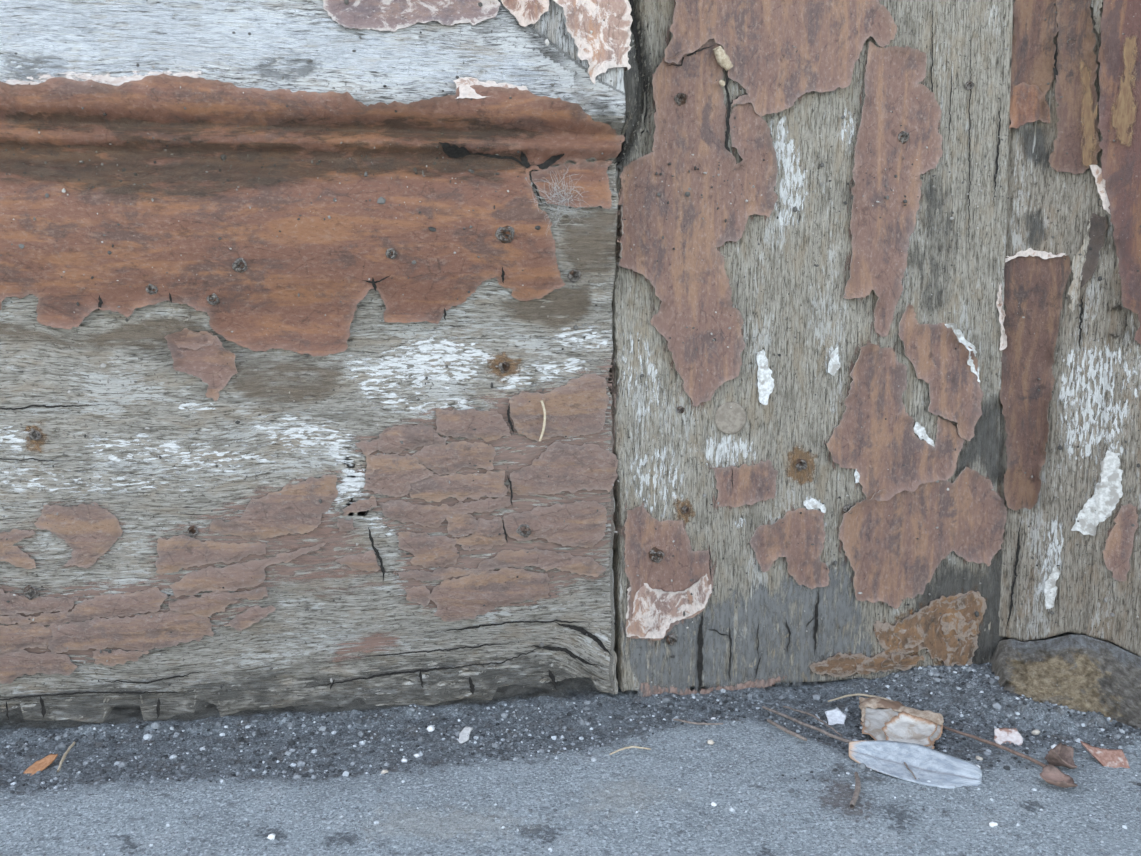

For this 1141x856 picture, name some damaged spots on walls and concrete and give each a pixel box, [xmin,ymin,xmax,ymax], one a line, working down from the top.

crack [614,0,648,165]
crack [669,46,711,66]
crack [724,71,746,167]
crack [931,0,1001,249]
peeling [0,0,1141,684]